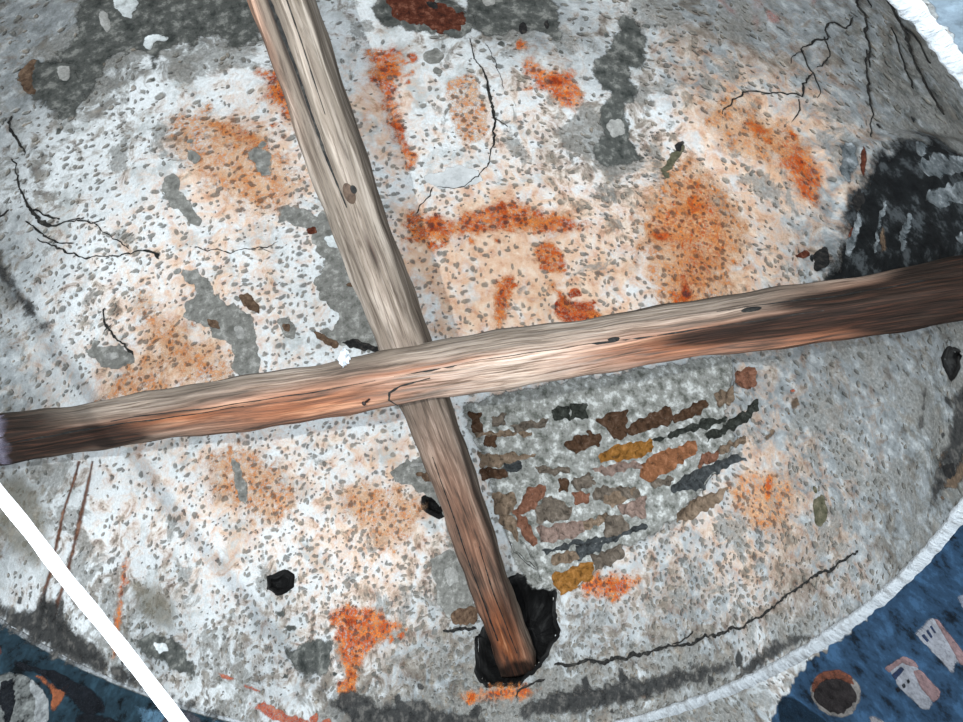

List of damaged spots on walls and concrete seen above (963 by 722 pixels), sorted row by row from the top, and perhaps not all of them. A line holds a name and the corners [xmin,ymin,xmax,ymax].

crack [0,116,159,259]
corrosion [173,105,295,210]
crack [416,39,508,214]
corrosion [403,201,601,328]
corrosion [523,60,581,106]
corrosion [637,159,748,304]
corrosion [705,97,821,205]
crack [722,0,945,137]
spalling [795,116,963,280]
spalling [423,355,759,689]
corrosion [329,604,407,693]
crack [516,550,858,698]